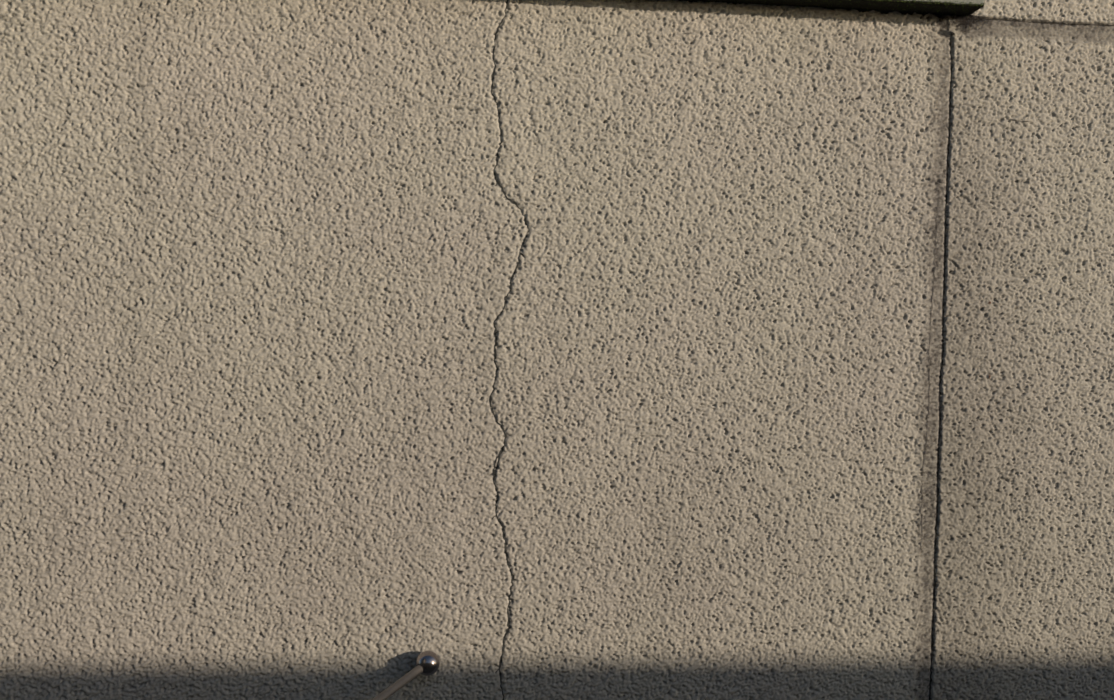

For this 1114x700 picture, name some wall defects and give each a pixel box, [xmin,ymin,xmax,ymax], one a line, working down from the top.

crack [489,0,529,700]